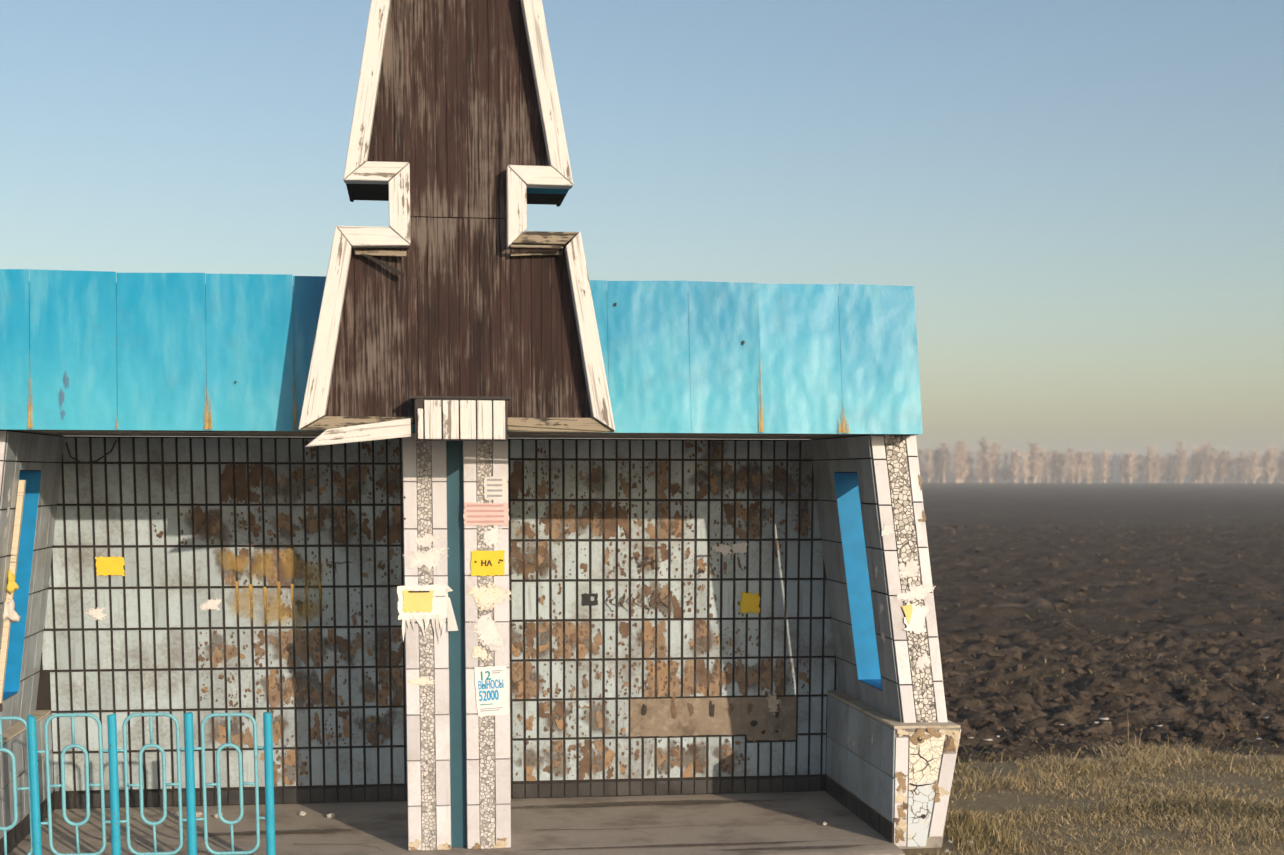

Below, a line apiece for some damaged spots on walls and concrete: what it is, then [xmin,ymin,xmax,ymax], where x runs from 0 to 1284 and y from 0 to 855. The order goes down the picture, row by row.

corrosion [204,404,212,429]
peeling [180,439,404,787]
peeling [508,440,812,781]
spalling [897,727,960,752]
peeling [894,771,908,843]
crack [910,746,940,819]